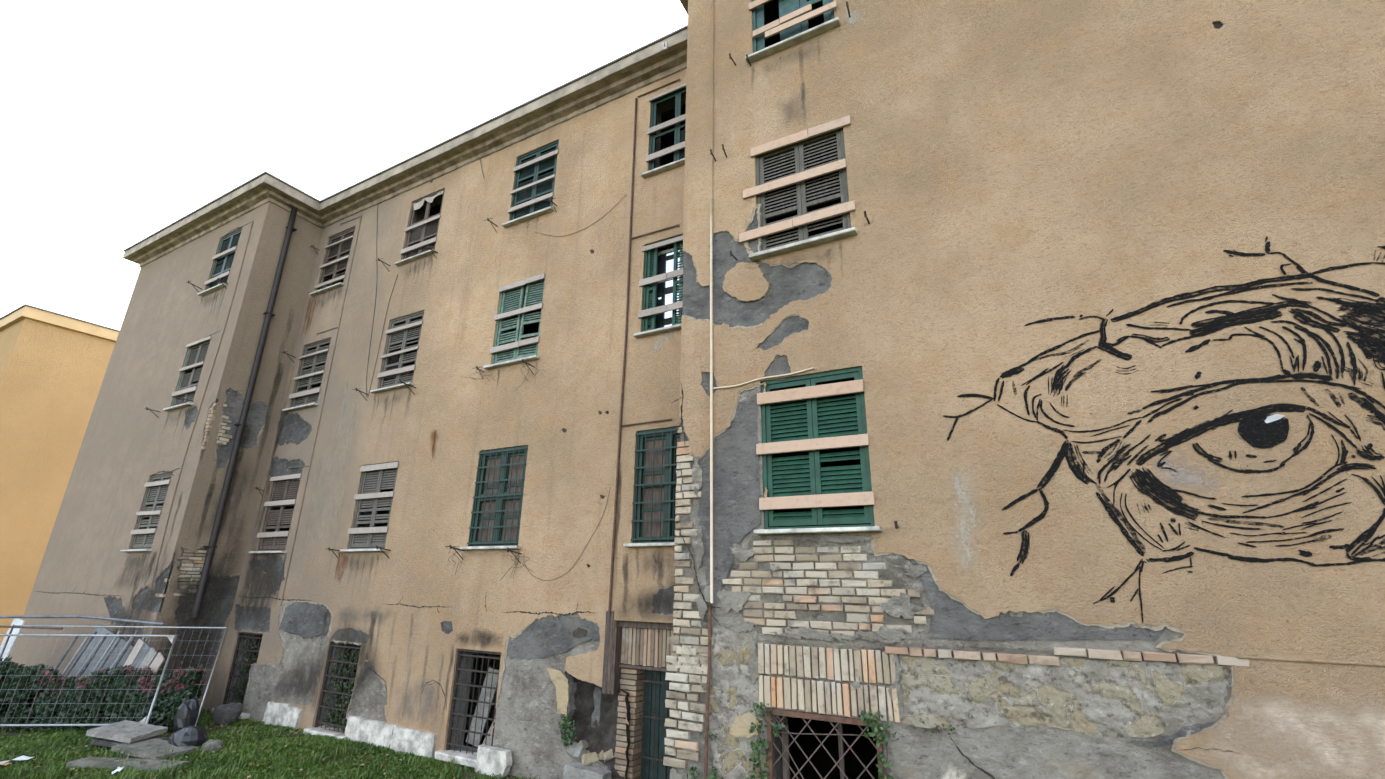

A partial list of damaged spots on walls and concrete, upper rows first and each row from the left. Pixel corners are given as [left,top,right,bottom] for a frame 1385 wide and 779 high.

flaking render [682,203,832,392]
flaking render [185,386,313,481]
flaking render [234,554,387,723]
spalling [572,616,602,641]
flaking render [722,532,934,640]
spalling [560,671,631,779]